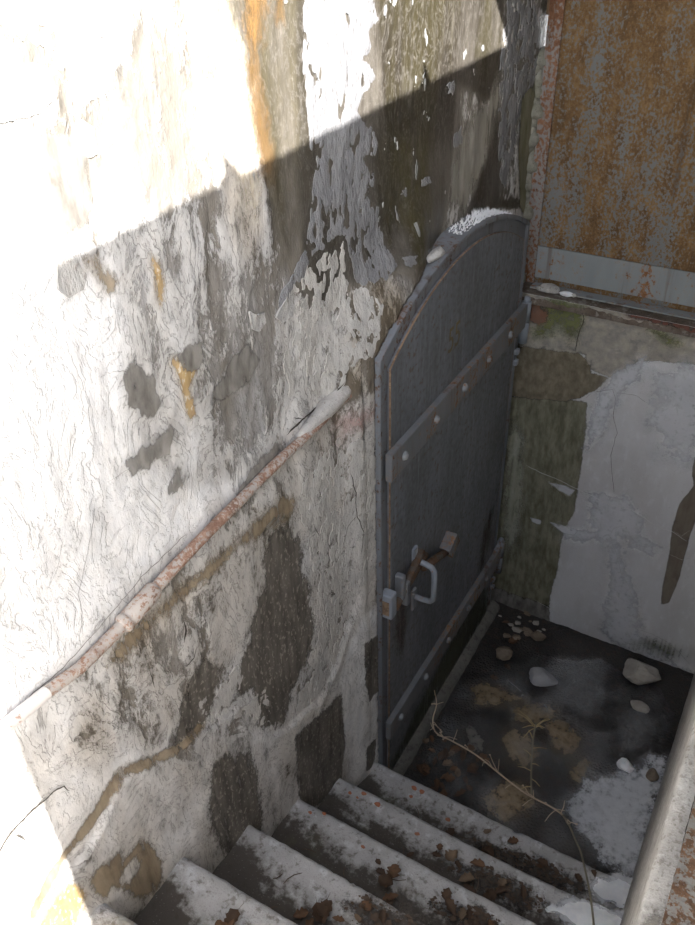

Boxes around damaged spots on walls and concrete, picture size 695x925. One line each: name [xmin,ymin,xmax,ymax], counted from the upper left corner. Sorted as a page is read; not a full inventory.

peeling [279,0,432,399]
leakage [451,87,501,222]
peeling [498,0,539,188]
leakage [518,74,537,214]
peeling [493,293,695,606]
leakage [108,495,314,731]
spalling [498,610,546,640]
crack [0,786,69,854]
leakage [209,748,263,854]
leakage [294,696,346,807]